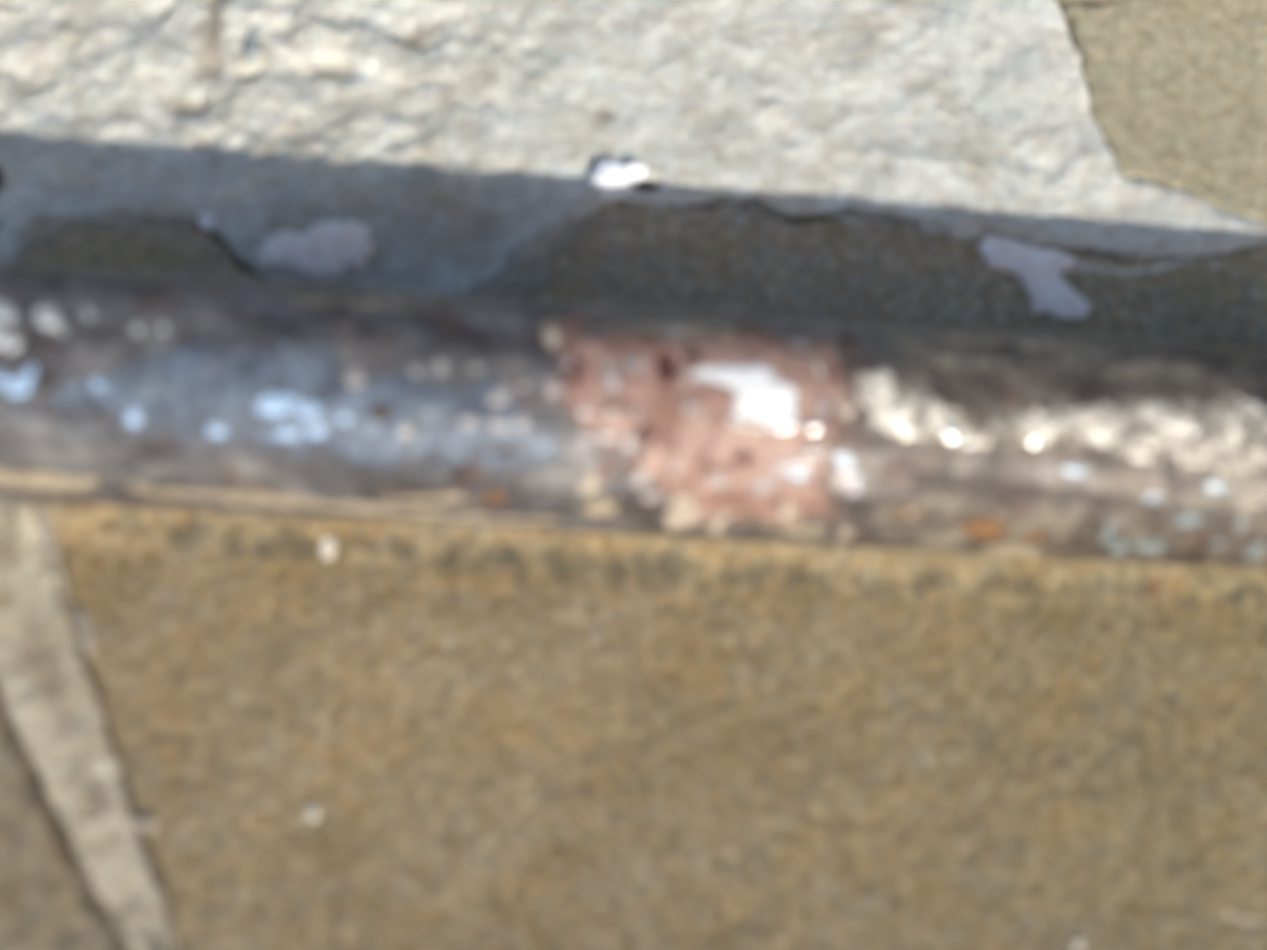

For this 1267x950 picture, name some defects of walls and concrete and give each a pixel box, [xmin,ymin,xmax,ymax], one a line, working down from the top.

peeling [199,213,215,231]
rust [546,312,851,530]
peeling [319,535,336,559]